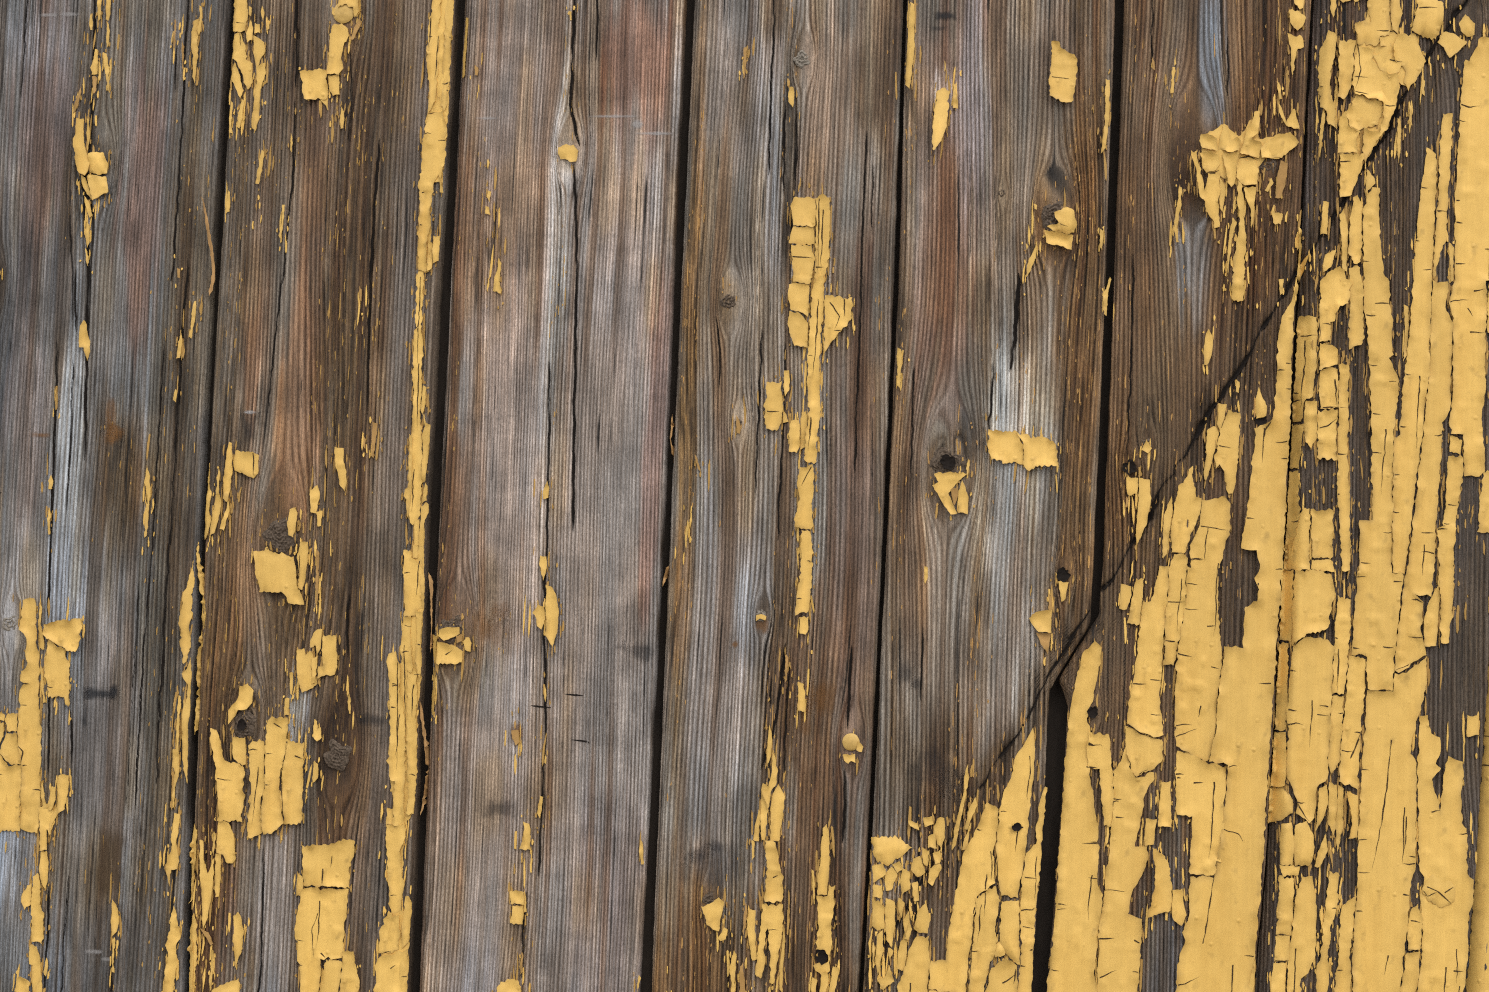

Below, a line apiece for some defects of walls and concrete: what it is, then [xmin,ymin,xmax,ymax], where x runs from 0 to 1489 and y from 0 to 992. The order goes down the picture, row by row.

peeling [72,0,120,274]
peeling [0,593,85,992]
peeling [159,0,483,992]
crack [519,912,527,977]
crack [538,0,599,876]
peeling [700,722,791,992]
peeling [731,178,855,727]
peeling [809,810,842,992]
crack [840,773,848,843]
crack [845,646,853,727]
crack [854,0,1468,992]
peeling [867,0,1489,992]